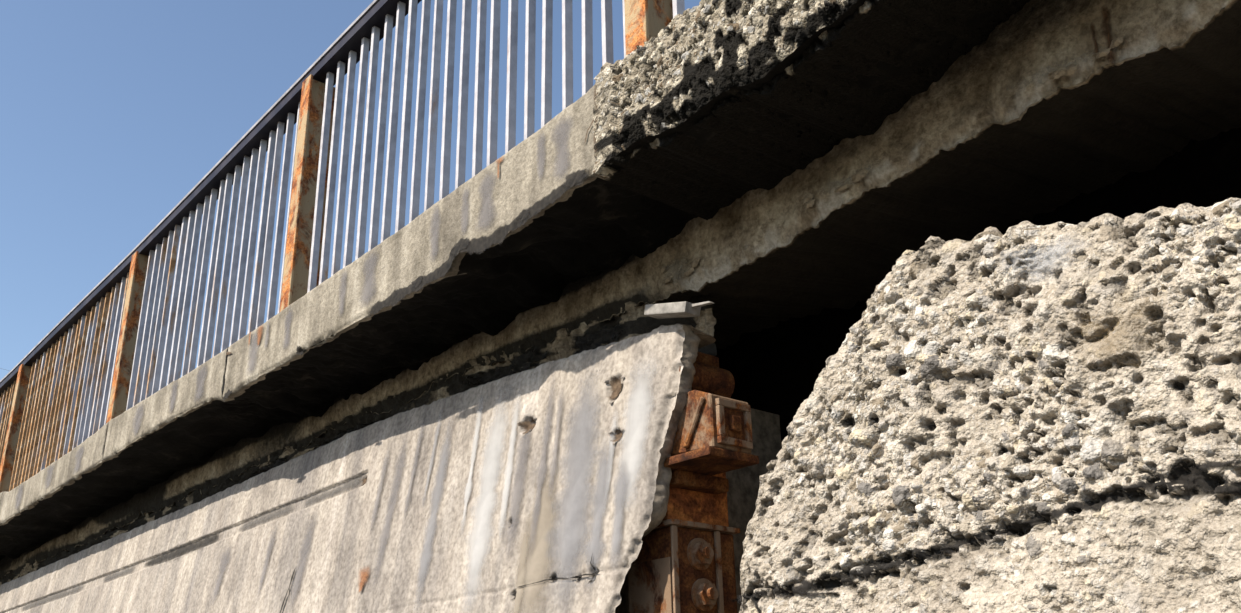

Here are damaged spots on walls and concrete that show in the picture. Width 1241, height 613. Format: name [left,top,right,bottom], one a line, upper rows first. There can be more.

spalling [592,0,1030,220]
leakage [250,458,288,477]
leakage [306,421,375,453]
leakage [372,424,448,590]
leakage [465,348,555,385]
leakage [464,378,649,613]
leakage [572,324,623,355]
crack [731,459,1241,613]